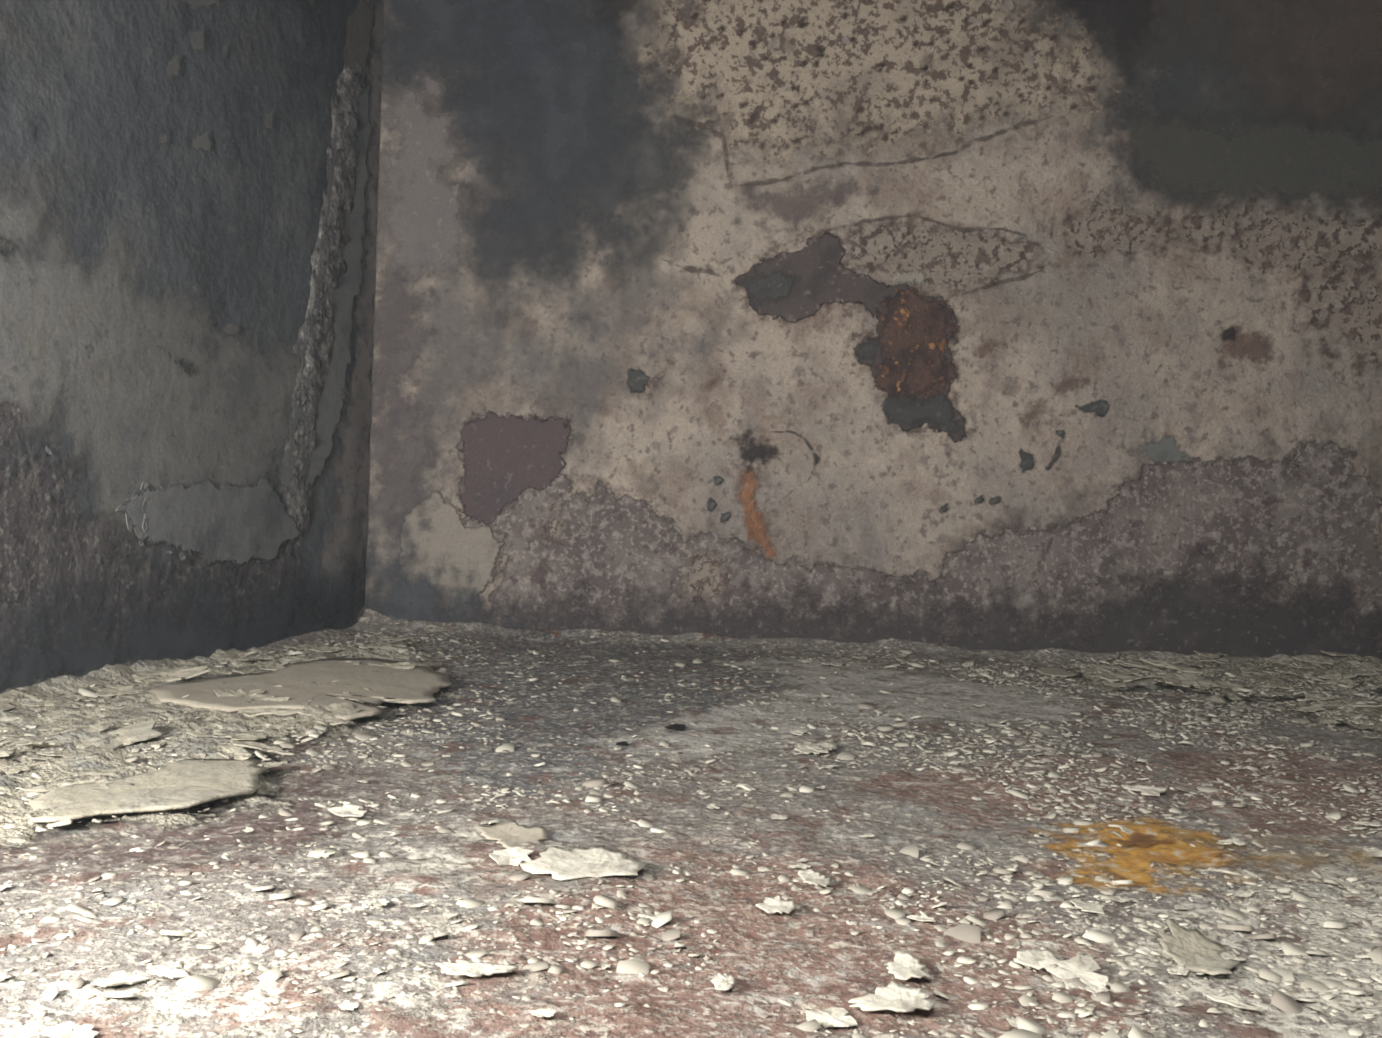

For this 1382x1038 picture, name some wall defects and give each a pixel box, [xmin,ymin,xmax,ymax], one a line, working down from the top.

leakage [1054,0,1150,69]
crack [674,116,1049,186]
leakage [743,182,876,223]
spalling [735,212,1044,445]
peeling [0,0,480,881]
rust [734,429,777,556]
peeling [398,411,1382,641]
peeling [1063,650,1382,736]
rust [1032,817,1269,894]